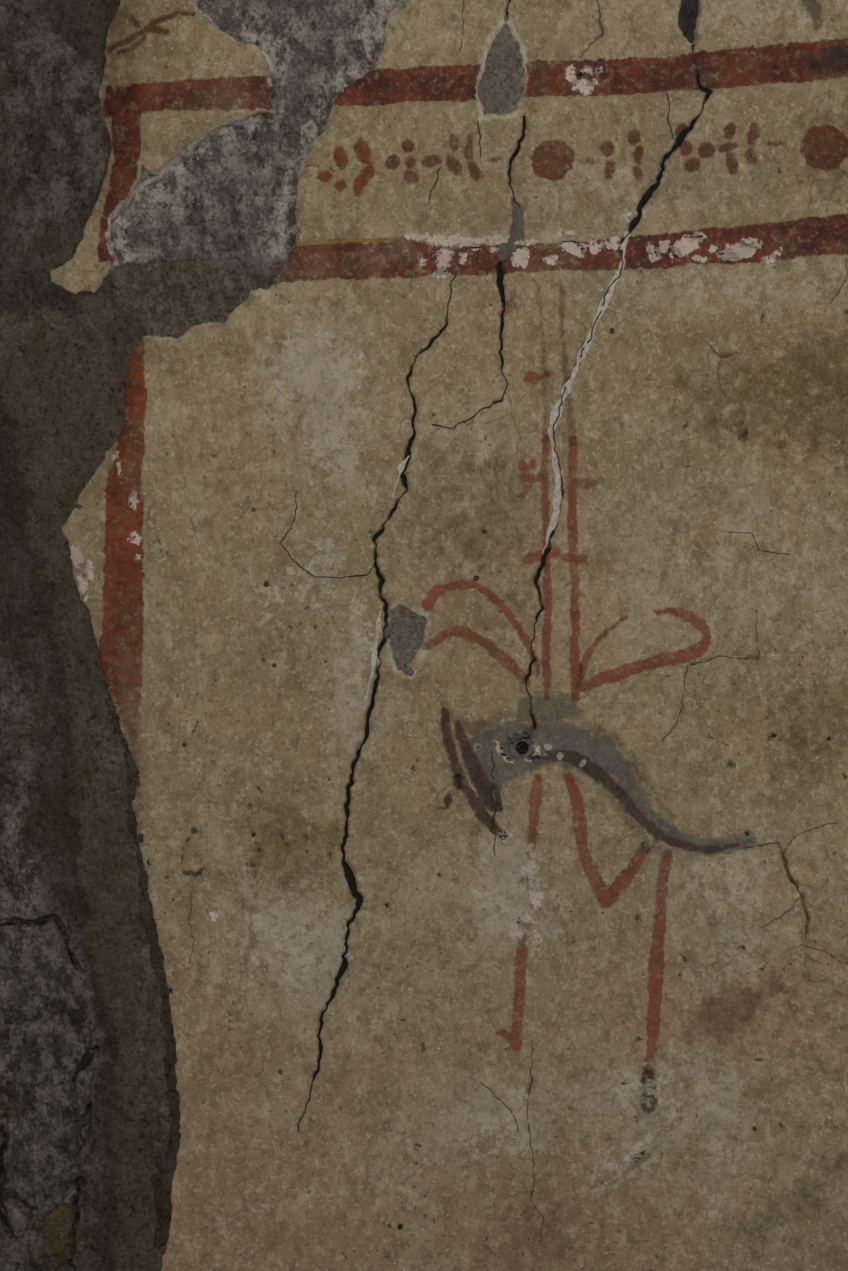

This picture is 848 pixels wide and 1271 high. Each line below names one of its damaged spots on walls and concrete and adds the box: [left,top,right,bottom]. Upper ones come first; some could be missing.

spalling [477,14,525,115]
crack [579,0,604,58]
peeling [404,228,621,279]
peeling [620,205,652,225]
peeling [645,231,783,264]
crack [525,42,712,728]
crack [697,334,737,396]
spalling [0,0,406,1271]
crack [280,116,526,1131]
spalling [384,605,427,677]
crack [661,610,760,742]
crack [744,822,843,964]